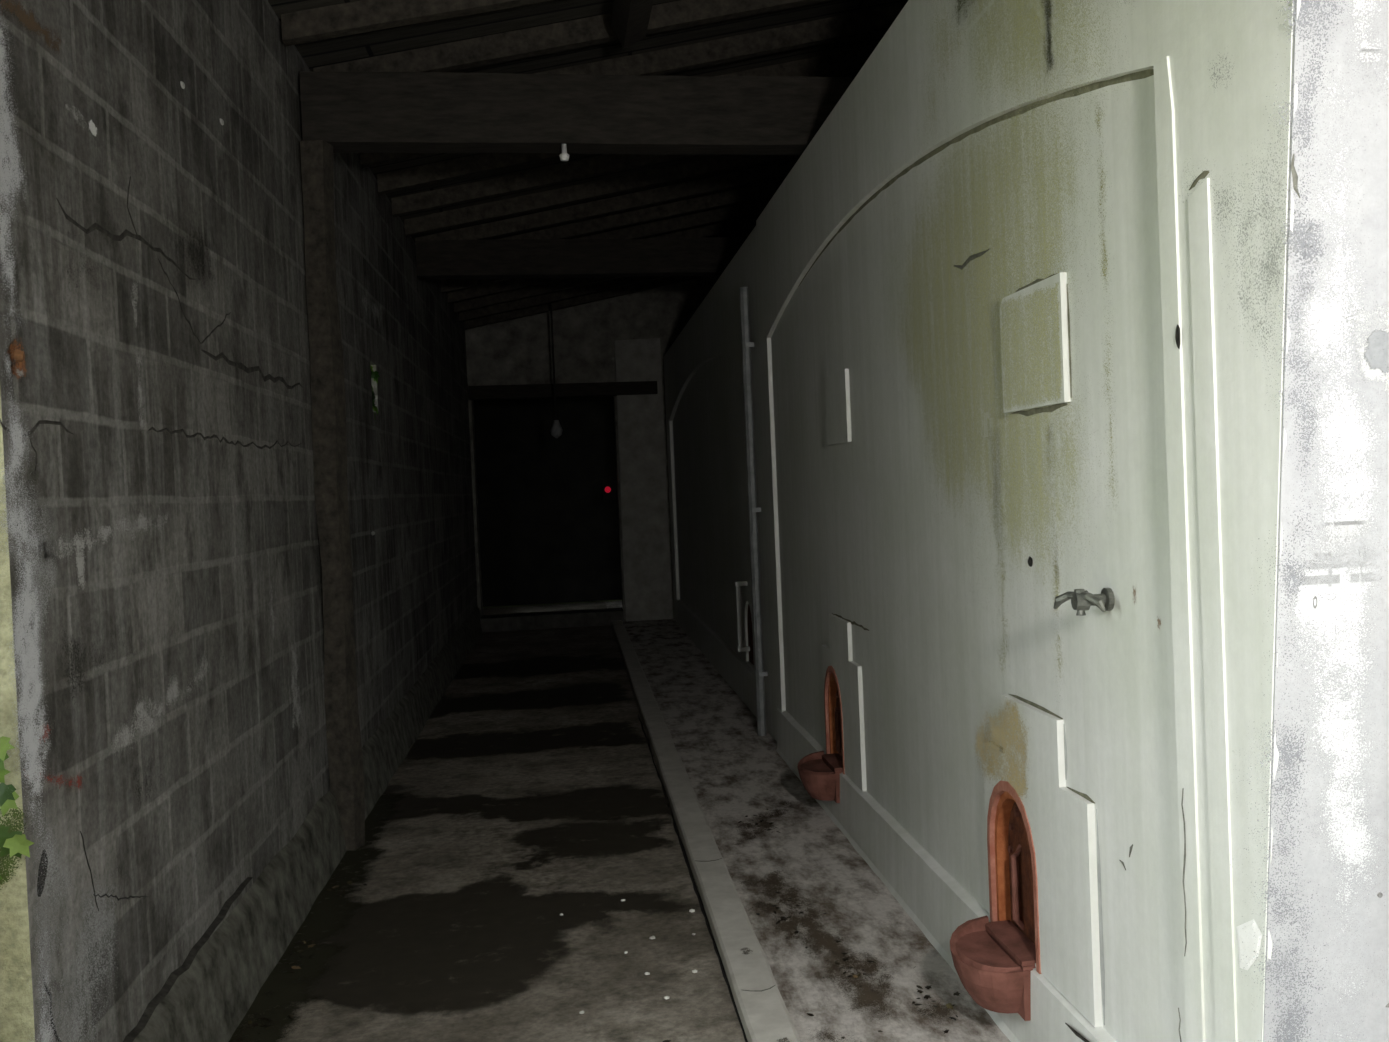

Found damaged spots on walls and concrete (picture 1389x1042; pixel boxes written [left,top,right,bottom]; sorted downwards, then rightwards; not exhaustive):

crack [56,176,303,389]
water stain [404,652,650,761]
crack [123,877,253,1042]
water stain [264,782,703,1025]